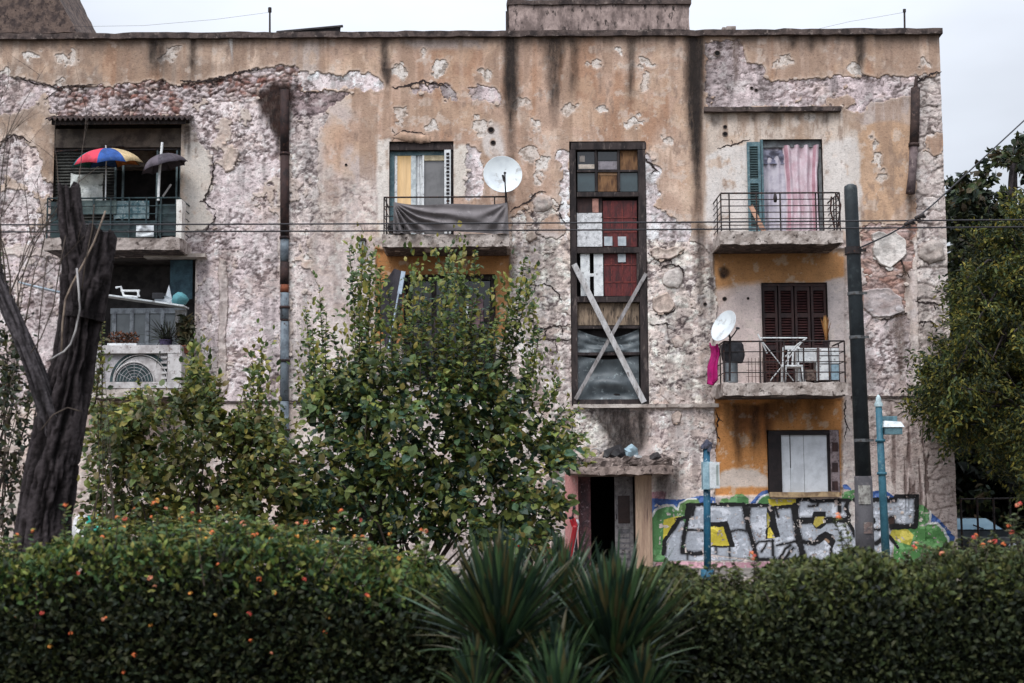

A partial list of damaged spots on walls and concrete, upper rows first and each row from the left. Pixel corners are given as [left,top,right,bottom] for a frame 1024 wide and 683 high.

crack [393,79,448,90]
leakage [505,37,516,130]
leakage [547,38,560,103]
leakage [686,37,704,196]
crack [200,158,216,231]
spalling [0,46,530,408]
spalling [704,39,958,551]
leakage [590,408,646,449]